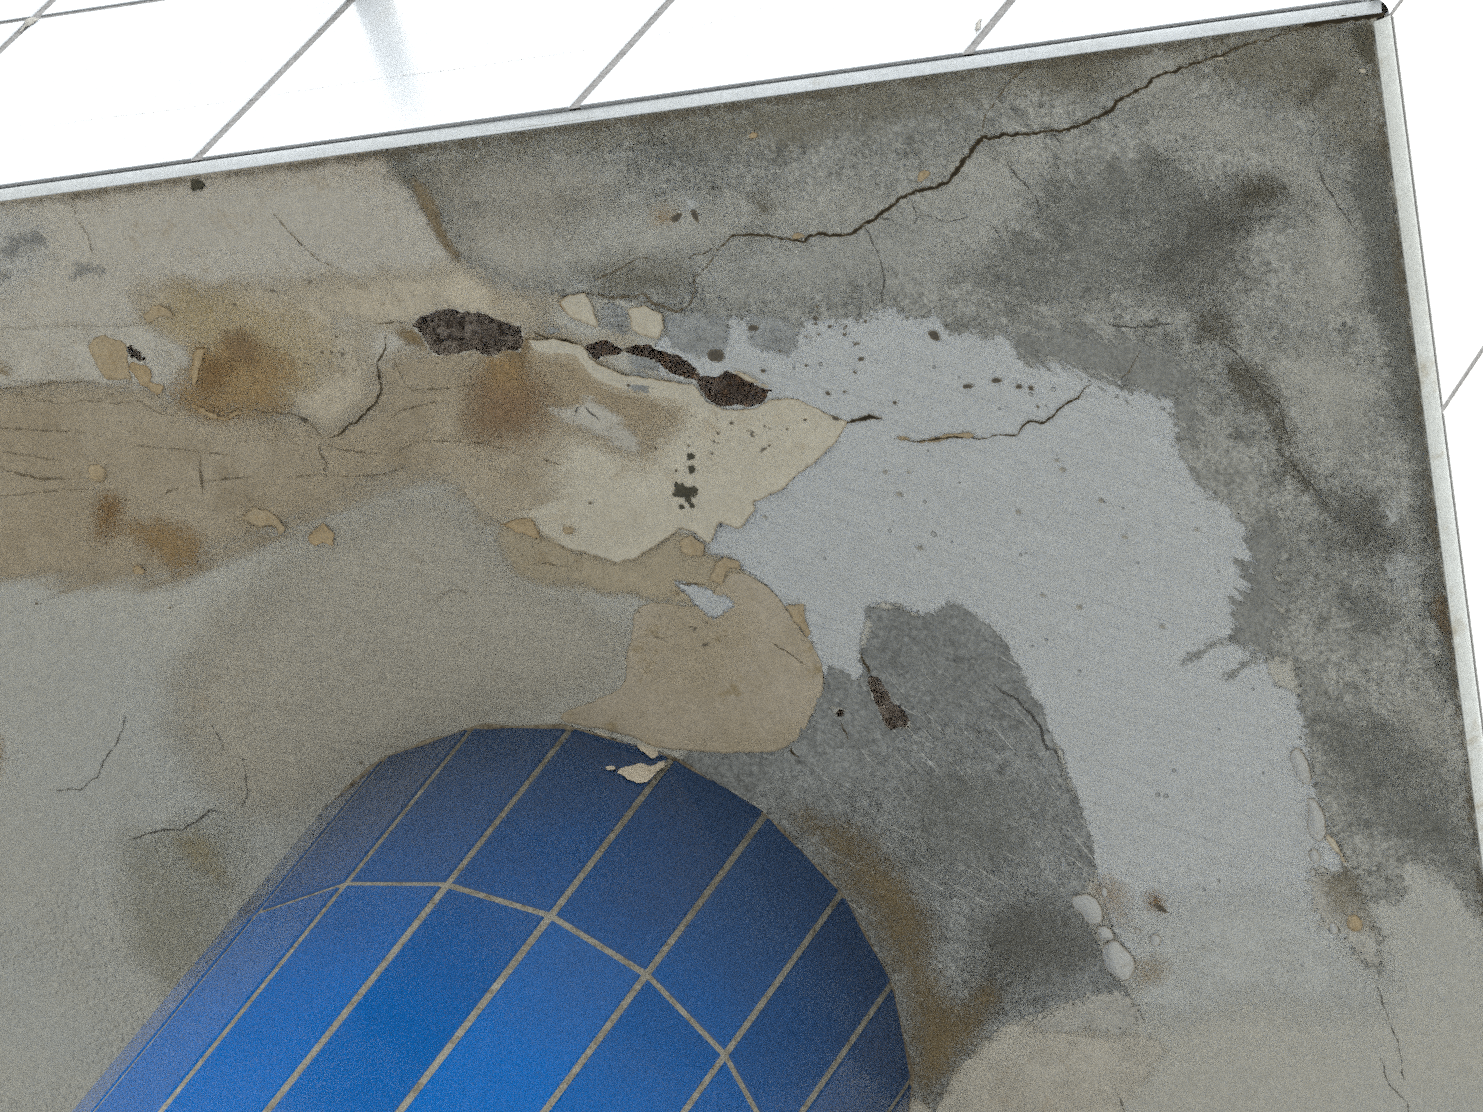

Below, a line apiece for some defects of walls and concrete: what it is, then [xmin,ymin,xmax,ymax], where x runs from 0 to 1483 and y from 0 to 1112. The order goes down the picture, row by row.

crack [594,13,1384,313]
peeling [89,335,164,395]
damp [0,273,688,599]
peeling [356,19,1483,979]
damp [377,20,1481,901]
crack [832,323,1340,520]
peeling [681,601,1132,1112]
damp [784,752,1121,1112]
damp [1318,865,1383,941]